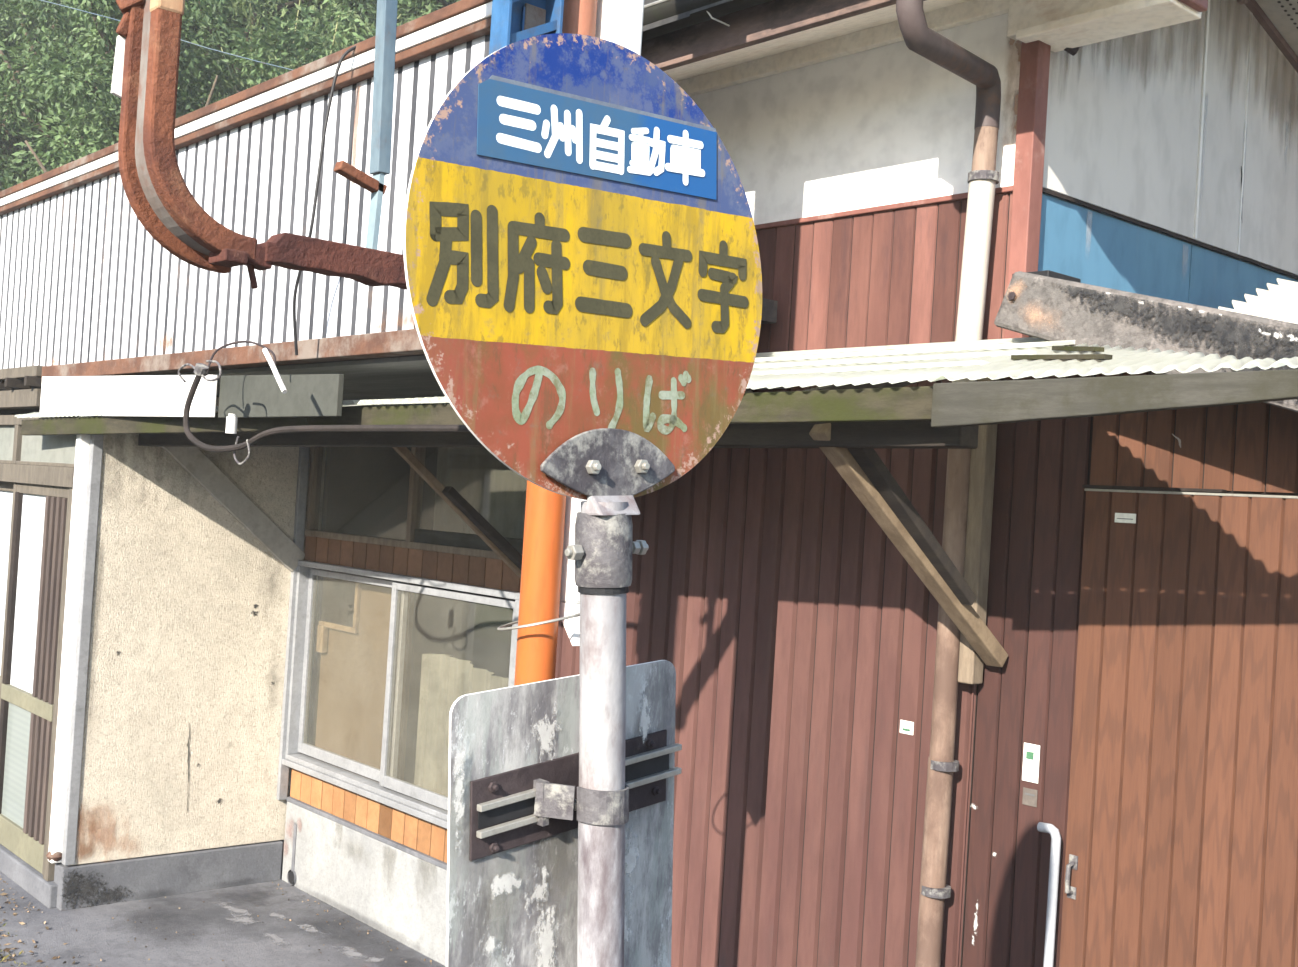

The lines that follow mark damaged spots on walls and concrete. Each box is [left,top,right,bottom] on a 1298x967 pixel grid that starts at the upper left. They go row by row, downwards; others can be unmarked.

damp [1059,285,1298,372]
crack [184,723,192,811]